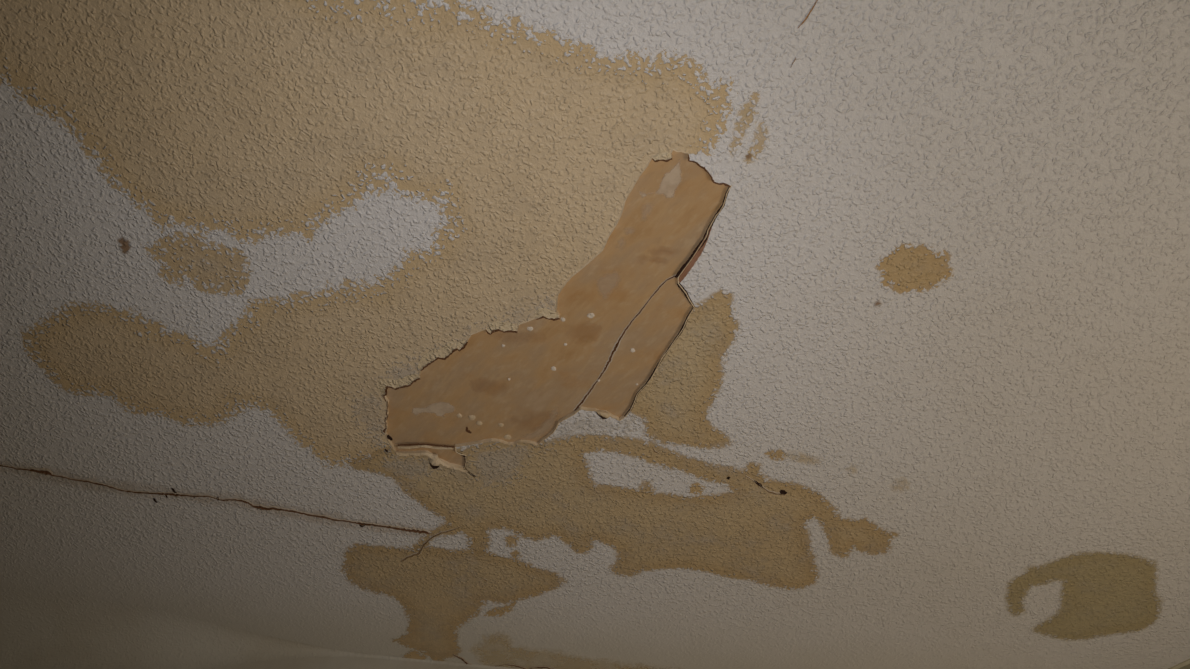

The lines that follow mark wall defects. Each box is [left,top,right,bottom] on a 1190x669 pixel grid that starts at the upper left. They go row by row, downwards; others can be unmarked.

leakage [0,0,898,661]
peeling [377,148,733,478]
leakage [876,244,953,294]
crack [0,464,460,562]
leakage [1006,552,1160,640]